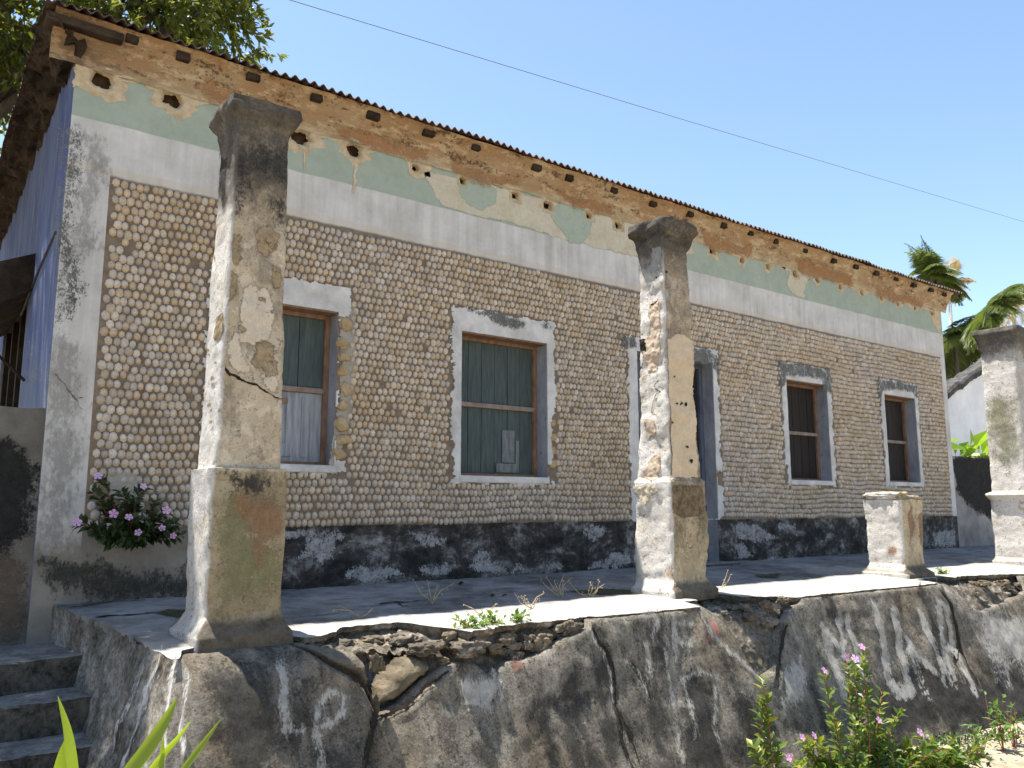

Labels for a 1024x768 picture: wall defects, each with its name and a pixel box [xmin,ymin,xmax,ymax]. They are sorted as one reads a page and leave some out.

peeling [72,63,84,88]
damp [54,124,90,323]
damp [218,142,288,224]
peeling [405,159,638,256]
peeling [206,225,283,392]
peeling [639,300,661,372]
peeling [719,250,941,334]
crack [225,367,282,399]
damp [0,435,41,555]
peeling [632,453,660,506]
spalling [672,484,704,518]
damp [37,554,187,617]